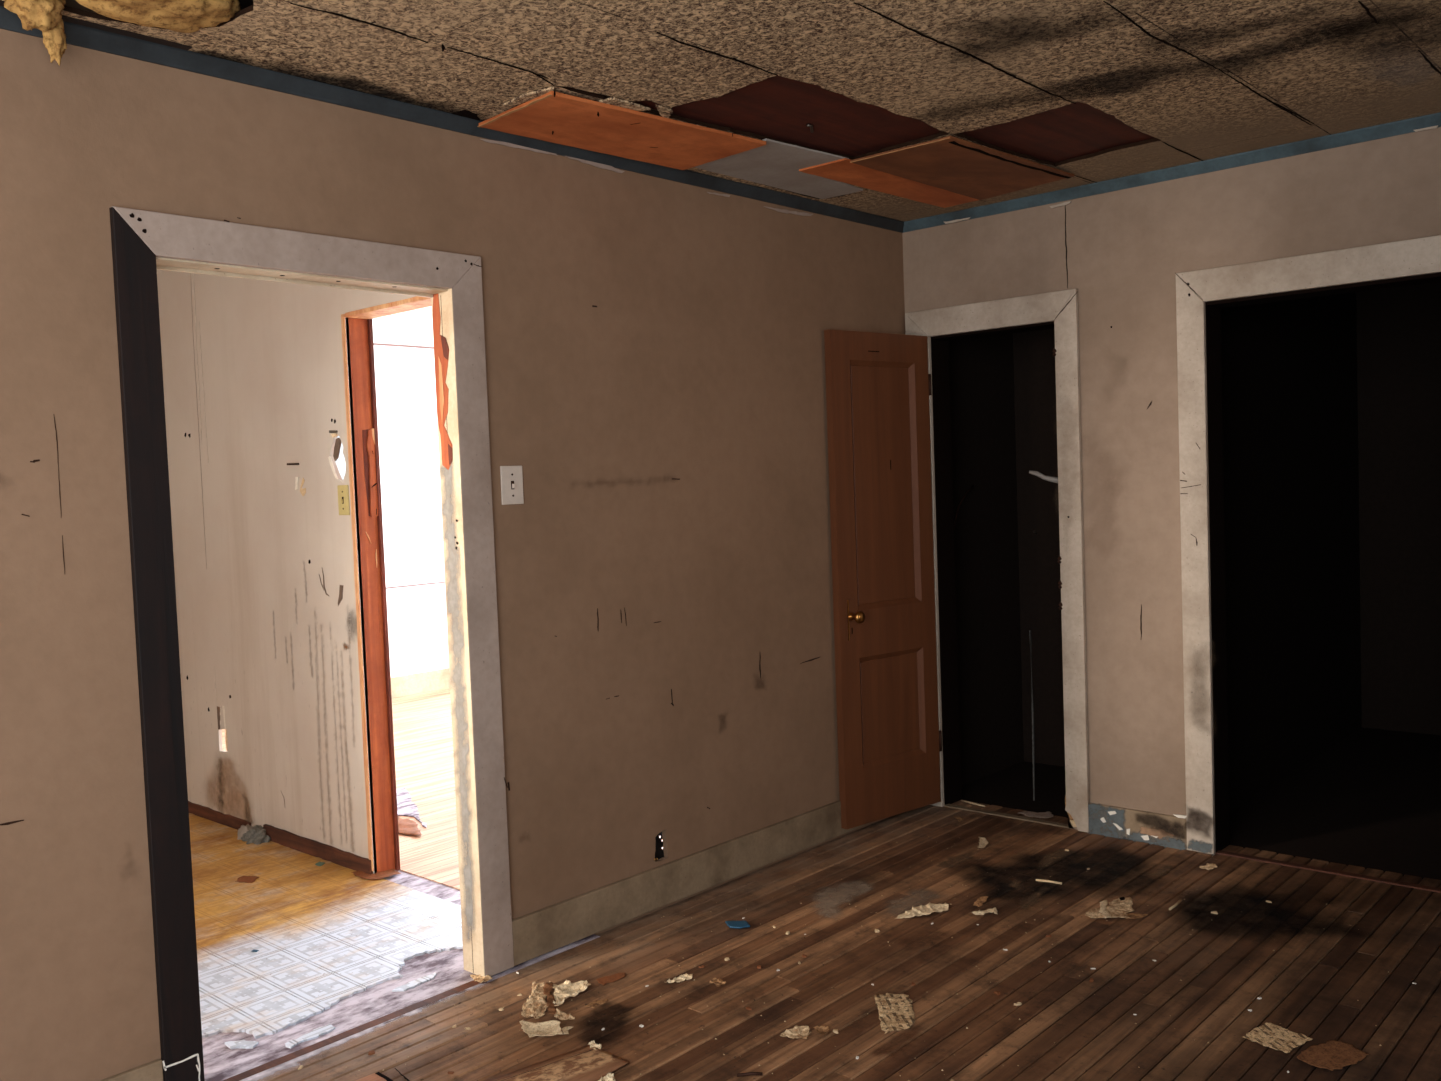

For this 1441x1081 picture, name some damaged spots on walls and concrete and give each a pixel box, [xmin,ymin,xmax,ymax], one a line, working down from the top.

peeling [481,139,624,173]
peeling [1088,804,1212,853]